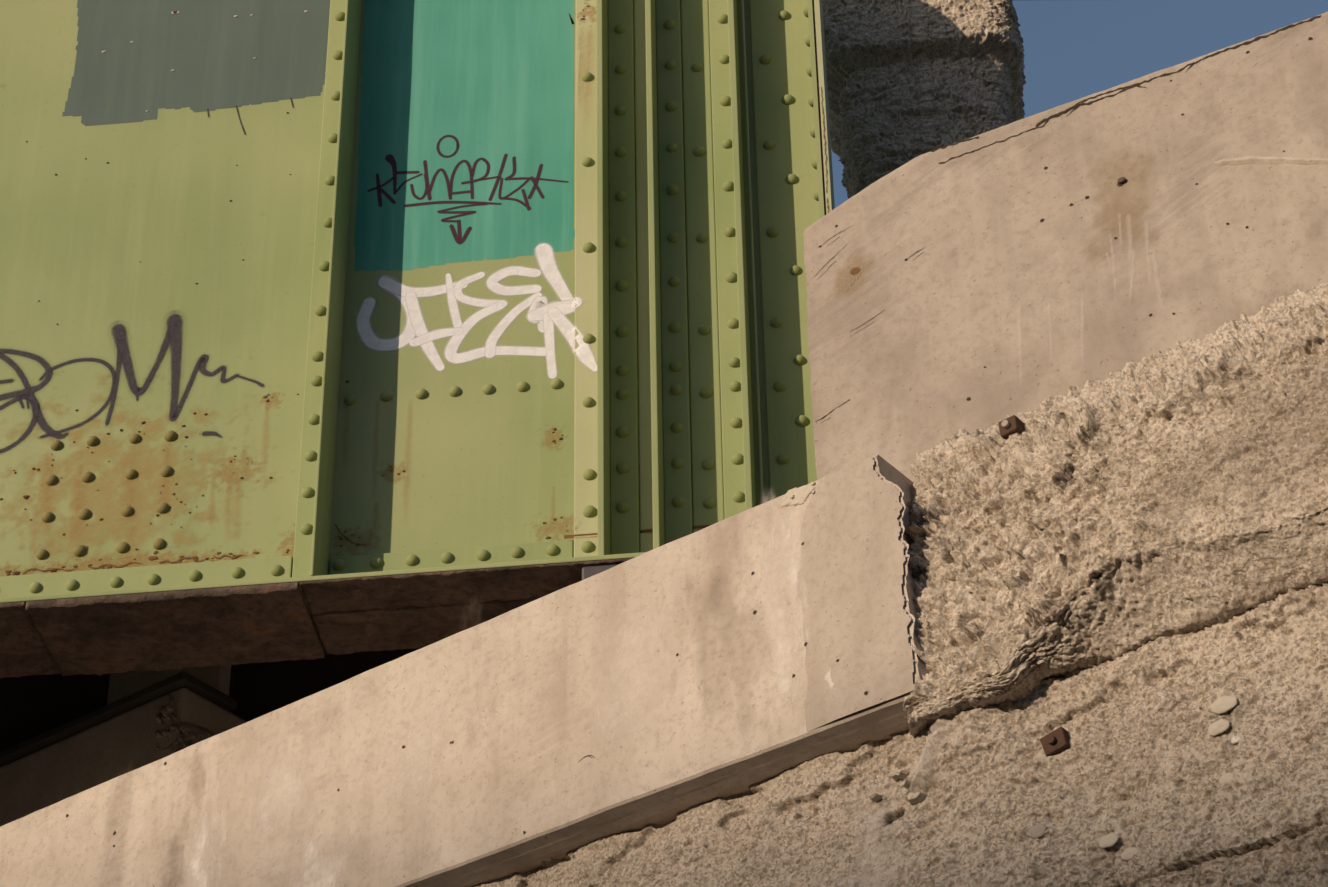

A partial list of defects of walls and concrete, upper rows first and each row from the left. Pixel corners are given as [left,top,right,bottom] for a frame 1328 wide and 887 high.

crack [931,15,1321,164]
corrosion [5,465,260,575]